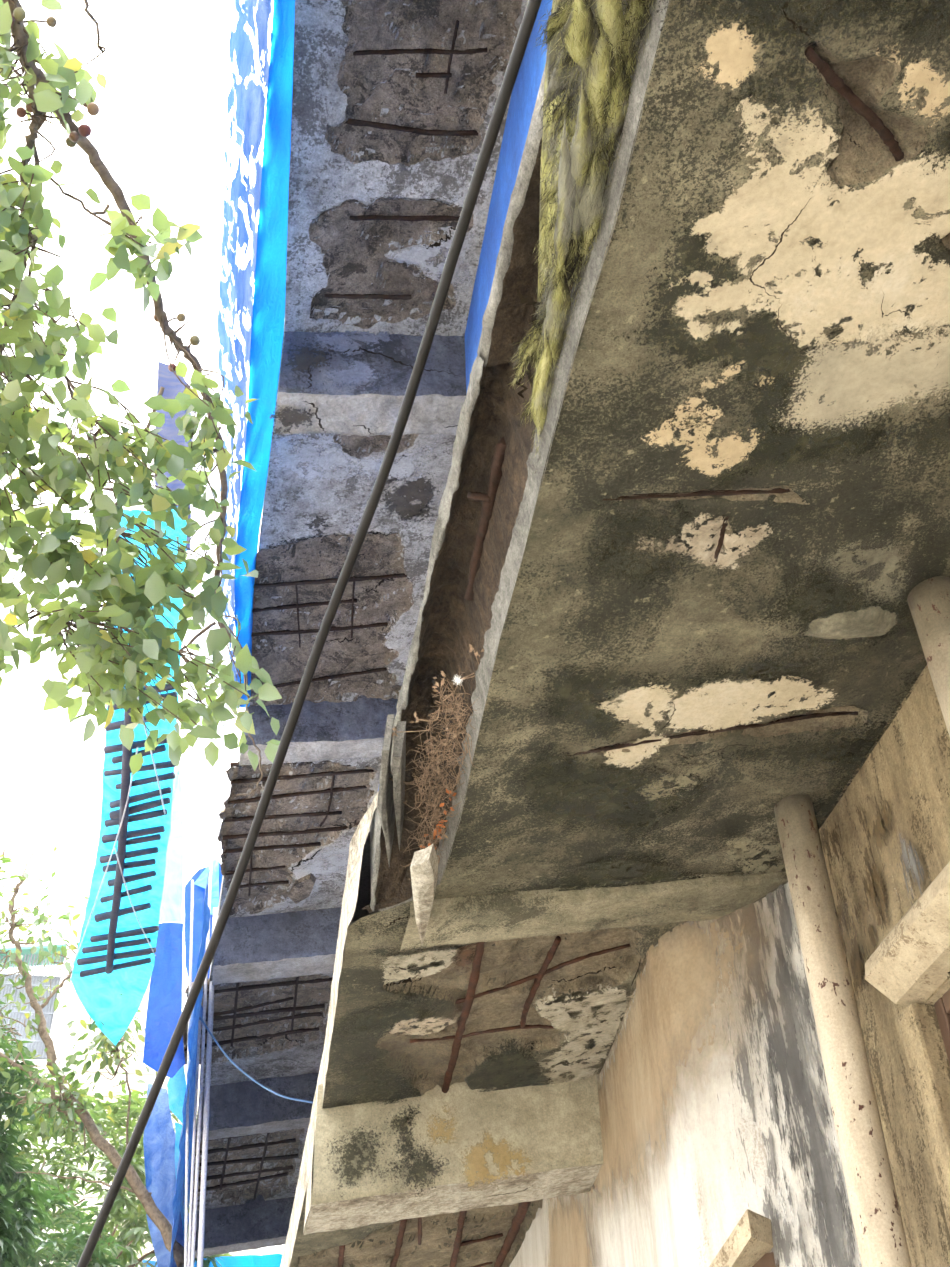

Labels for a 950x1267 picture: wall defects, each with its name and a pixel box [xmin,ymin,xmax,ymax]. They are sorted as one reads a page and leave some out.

crack [783,8,814,40]
peeling [603,19,950,570]
spalling [217,0,671,916]
peeling [567,675,868,801]
damp [512,556,927,1002]
spalling [193,1128,304,1204]
spalling [183,974,333,1065]
mould [324,982,454,1199]
spalling [298,1199,543,1267]
rust [453,942,485,973]
spalling [376,927,644,1191]
damp [548,883,862,1267]